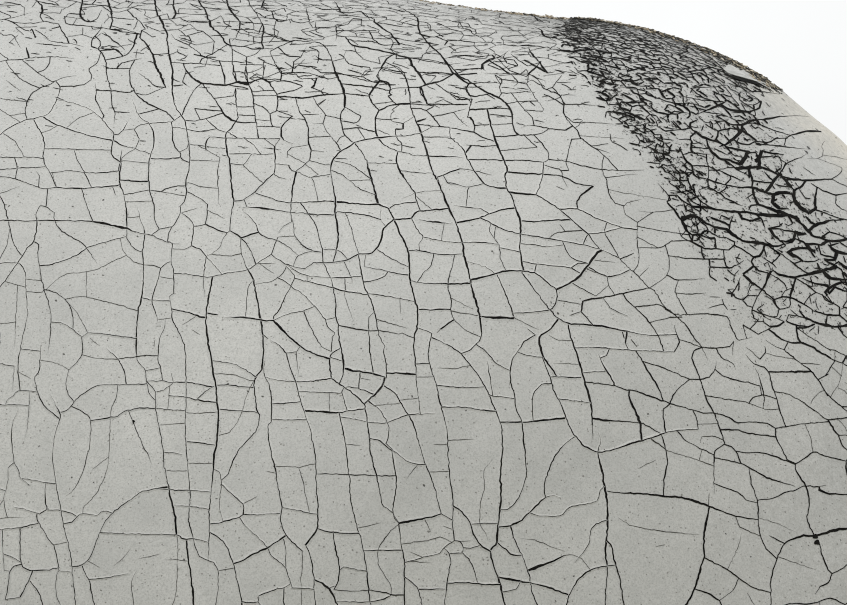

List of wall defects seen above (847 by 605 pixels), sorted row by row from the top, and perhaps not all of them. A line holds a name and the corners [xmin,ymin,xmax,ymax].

crack [0,0,63,46]
crack [163,0,186,24]
crack [257,0,282,11]
crack [444,5,504,52]
crack [35,272,75,317]
crack [0,302,17,348]
crack [130,570,138,605]
crack [785,597,847,605]
crack [815,540,847,594]